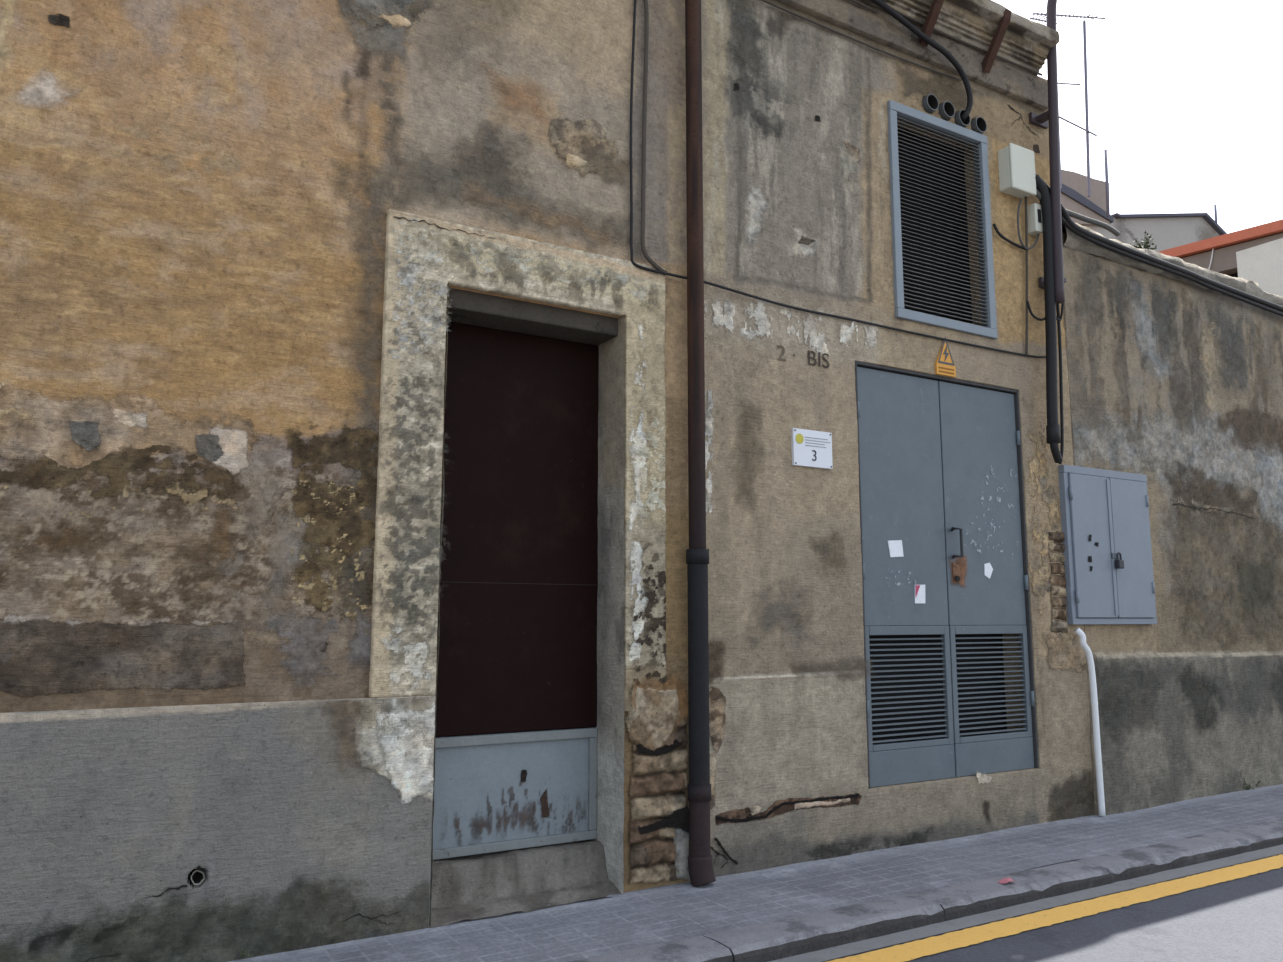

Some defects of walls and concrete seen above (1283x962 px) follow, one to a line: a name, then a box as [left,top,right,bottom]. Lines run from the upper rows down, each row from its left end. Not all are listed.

water stain [728,0,785,135]
water stain [747,186,766,242]
water stain [792,228,818,256]
water stain [1077,260,1283,452]
flaking render [0,383,259,602]
flaking render [286,425,442,803]
flaking render [628,407,691,884]
water stain [1169,464,1283,702]
corrosion [455,789,574,835]
flaking render [709,686,726,809]
crack [711,793,862,868]
water stain [0,878,430,962]